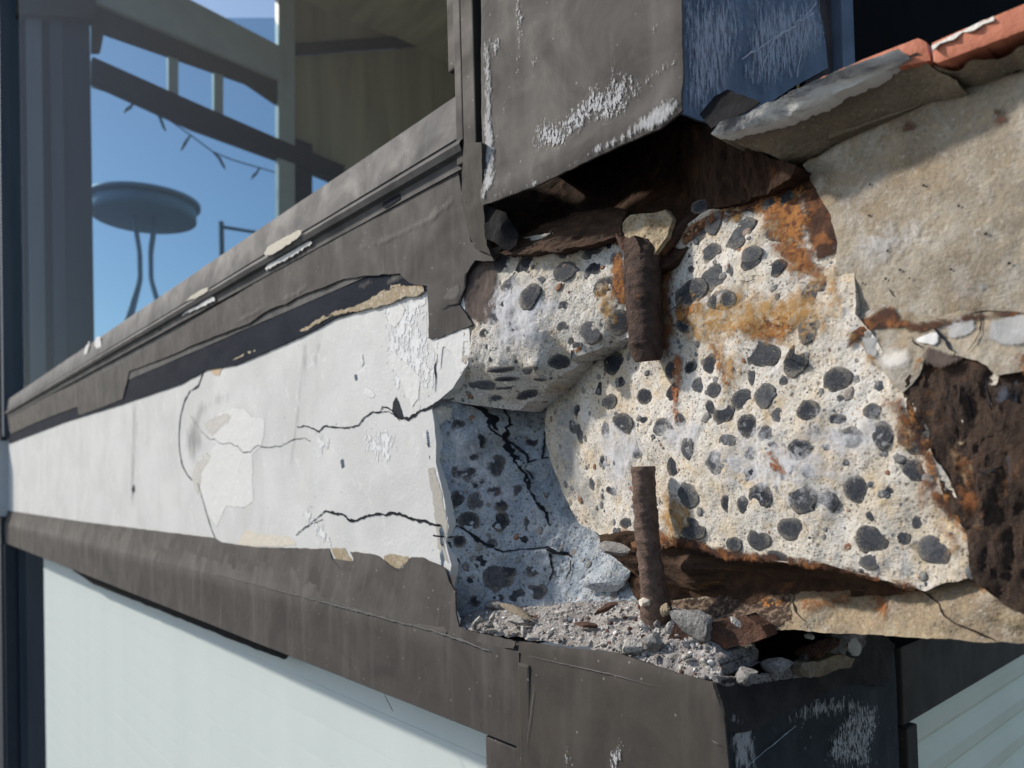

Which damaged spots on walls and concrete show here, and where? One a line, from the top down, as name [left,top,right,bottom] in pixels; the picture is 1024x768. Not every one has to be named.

corrosion [660,123,843,422]
corrosion [847,307,1018,347]
peeling [192,407,265,527]
peeling [237,530,296,547]
crack [179,338,572,581]
spalling [300,190,1024,643]
corrosion [888,400,975,553]